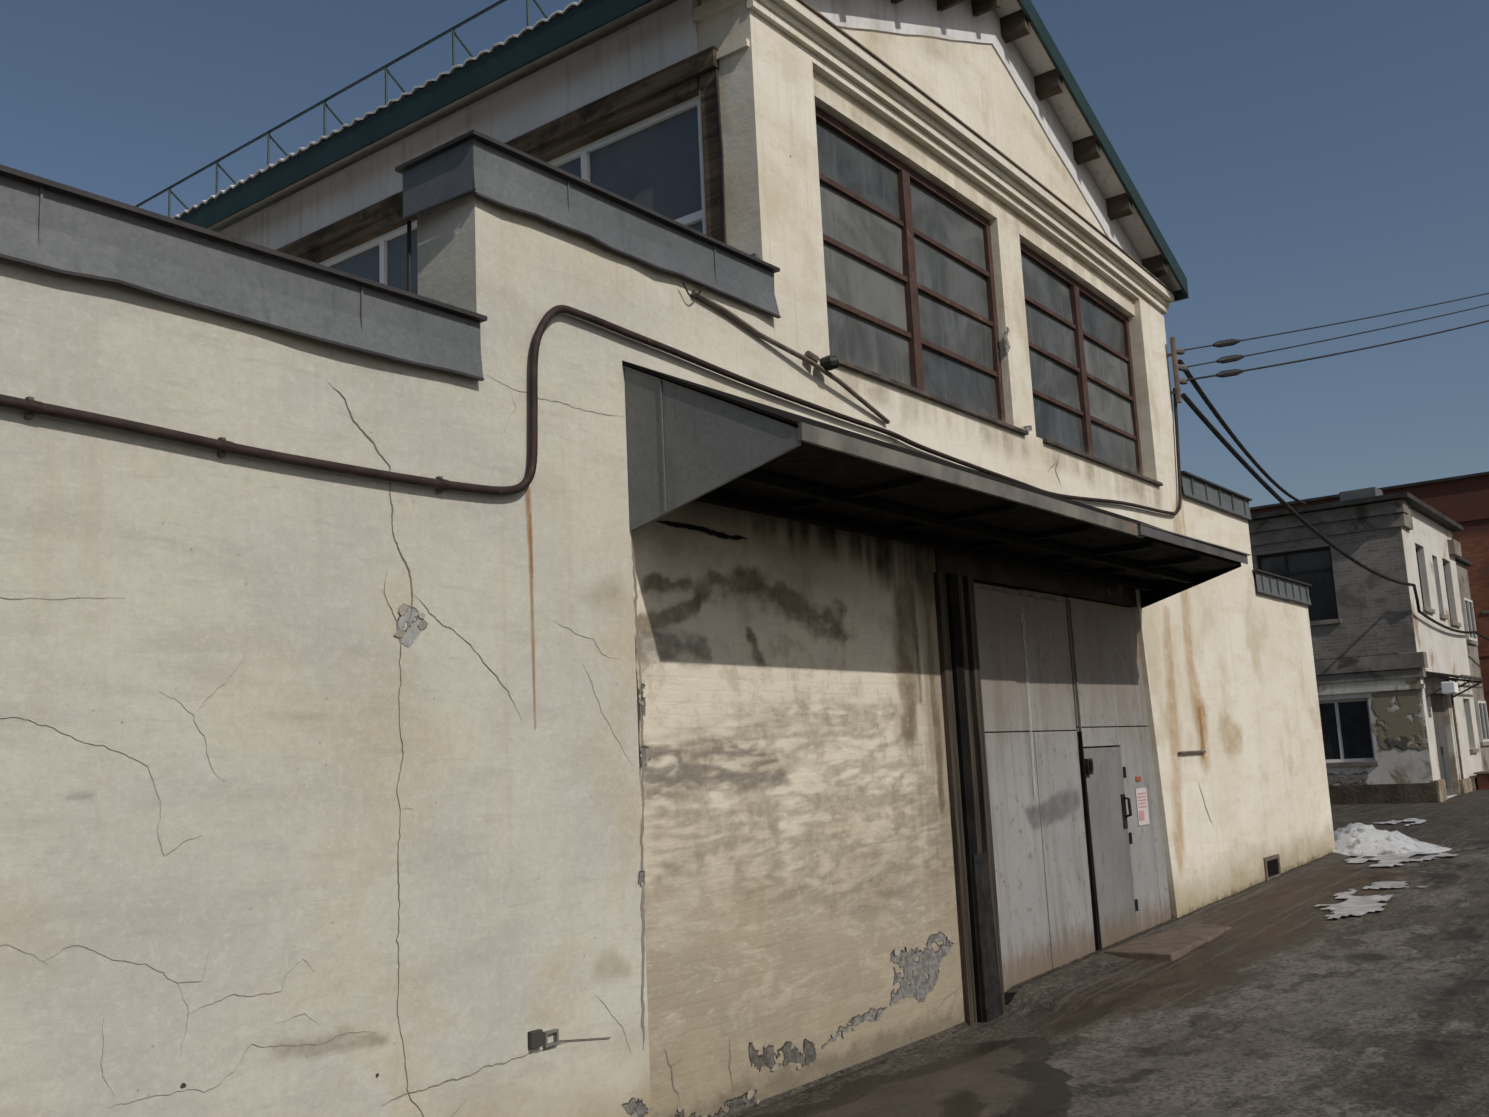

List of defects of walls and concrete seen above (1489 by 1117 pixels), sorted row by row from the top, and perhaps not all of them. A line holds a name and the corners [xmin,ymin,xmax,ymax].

spalling [394,603,428,647]
damp [635,569,846,662]
crack [0,382,569,1117]
damp [897,579,944,809]
spalling [1371,689,1426,751]
crack [559,520,748,1097]
spalling [749,931,954,1072]
spalling [622,1097,653,1117]
spalling [675,1089,760,1117]